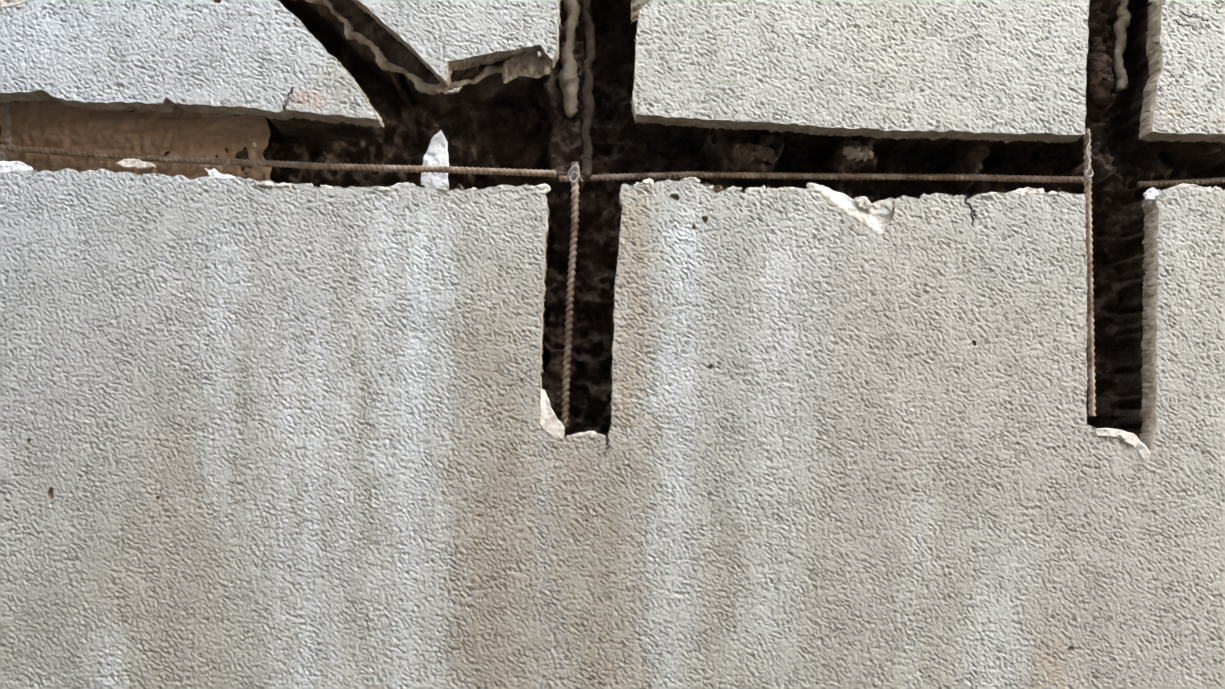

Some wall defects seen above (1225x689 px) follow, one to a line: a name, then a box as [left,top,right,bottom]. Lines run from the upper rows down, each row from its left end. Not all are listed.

spalling [0,0,27,13]
spalling [631,0,650,22]
spalling [502,51,552,84]
spalling [1137,177,1225,194]
spalling [0,102,1151,461]
rust [612,181,668,437]